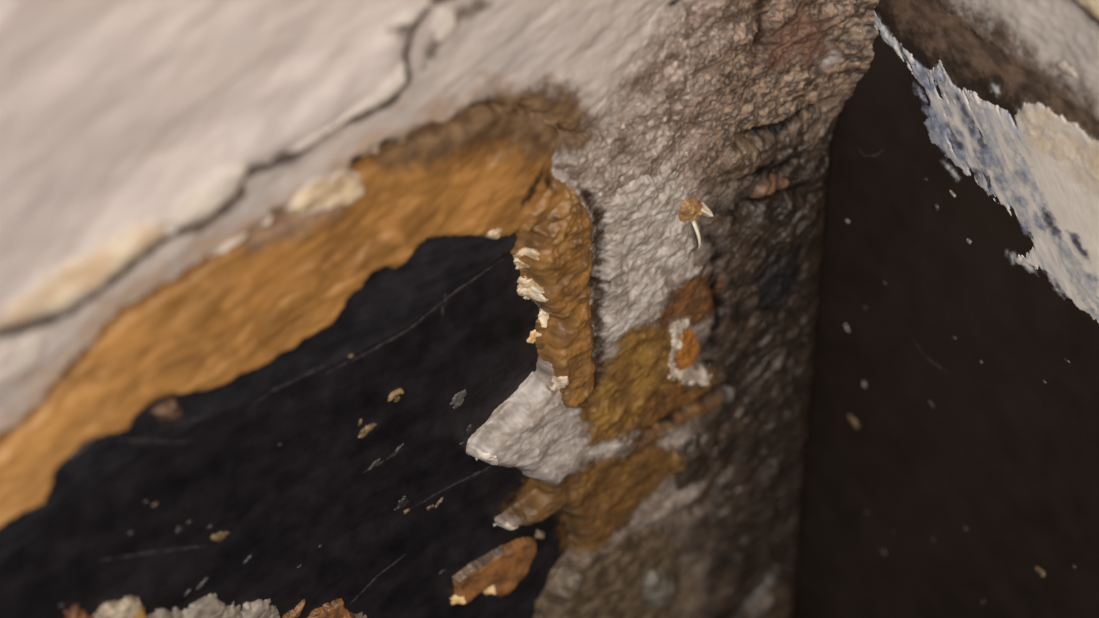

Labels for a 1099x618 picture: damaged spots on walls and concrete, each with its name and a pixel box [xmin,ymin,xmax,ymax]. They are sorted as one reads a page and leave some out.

crack [0,0,485,337]
peeling [0,0,879,618]
corrosion [503,267,724,555]